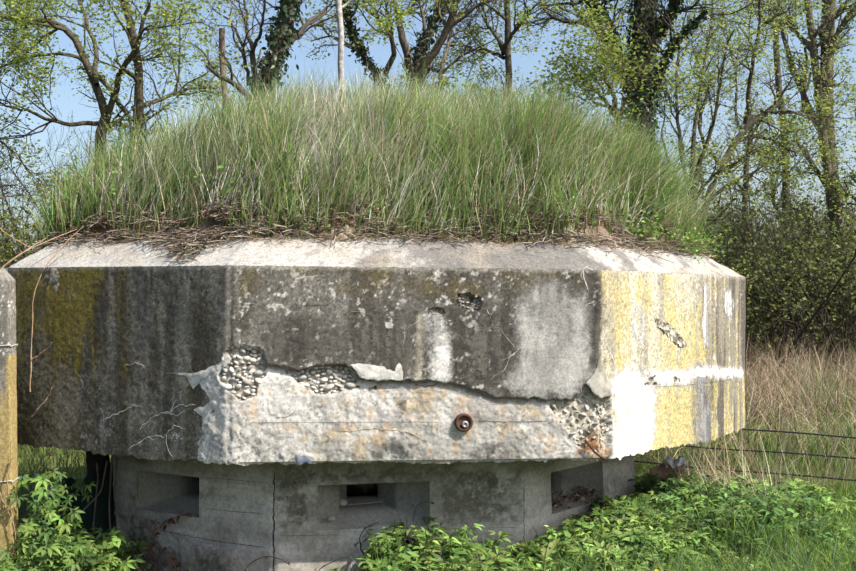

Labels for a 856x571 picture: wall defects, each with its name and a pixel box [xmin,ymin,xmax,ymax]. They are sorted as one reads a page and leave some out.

spalling [655,316,687,349]
efflorescence [700,280,711,348]
efflorescence [724,290,734,319]
spalling [177,280,612,466]
crack [102,402,194,457]
rust [578,431,607,461]
crack [269,471,277,571]